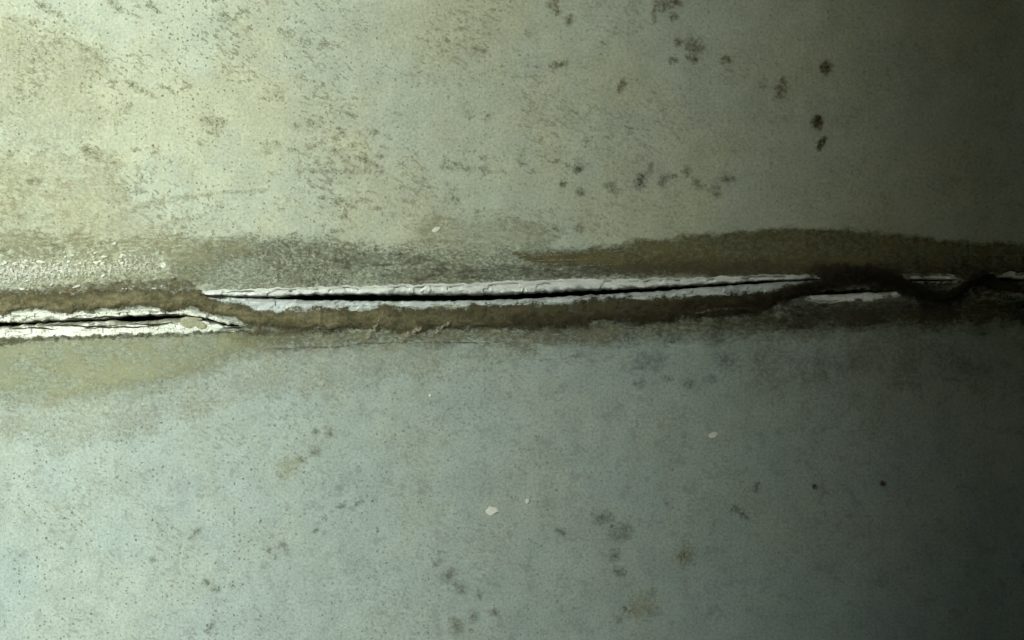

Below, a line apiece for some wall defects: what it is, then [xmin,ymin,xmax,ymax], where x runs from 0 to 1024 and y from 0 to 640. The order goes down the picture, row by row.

crack [0,273,961,339]
damp [0,228,1024,400]
crack [990,271,1024,286]